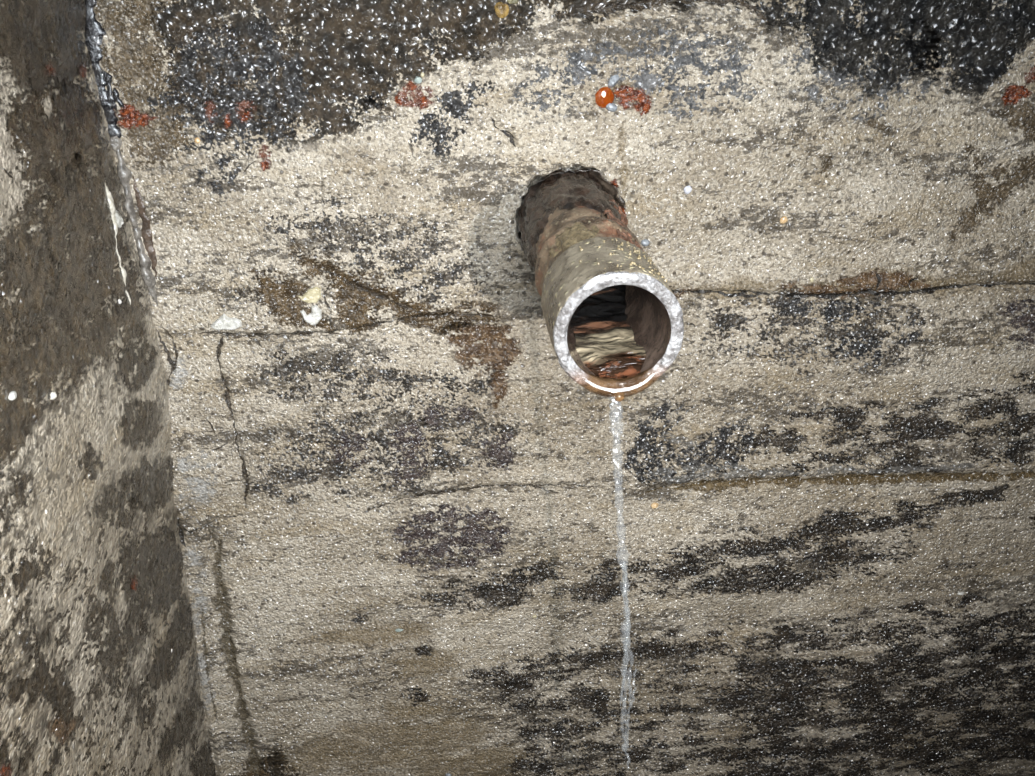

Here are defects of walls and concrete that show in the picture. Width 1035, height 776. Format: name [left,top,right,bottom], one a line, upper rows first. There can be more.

corrosion [117,104,156,130]
corrosion [395,80,435,110]
corrosion [612,85,651,116]
damp [512,19,758,119]
damp [735,0,1035,131]
corrosion [1001,66,1035,105]
damp [0,0,690,477]
corrosion [518,168,626,271]
crack [672,272,1035,303]
damp [774,268,933,367]
crack [156,251,502,547]
damp [719,609,1035,776]